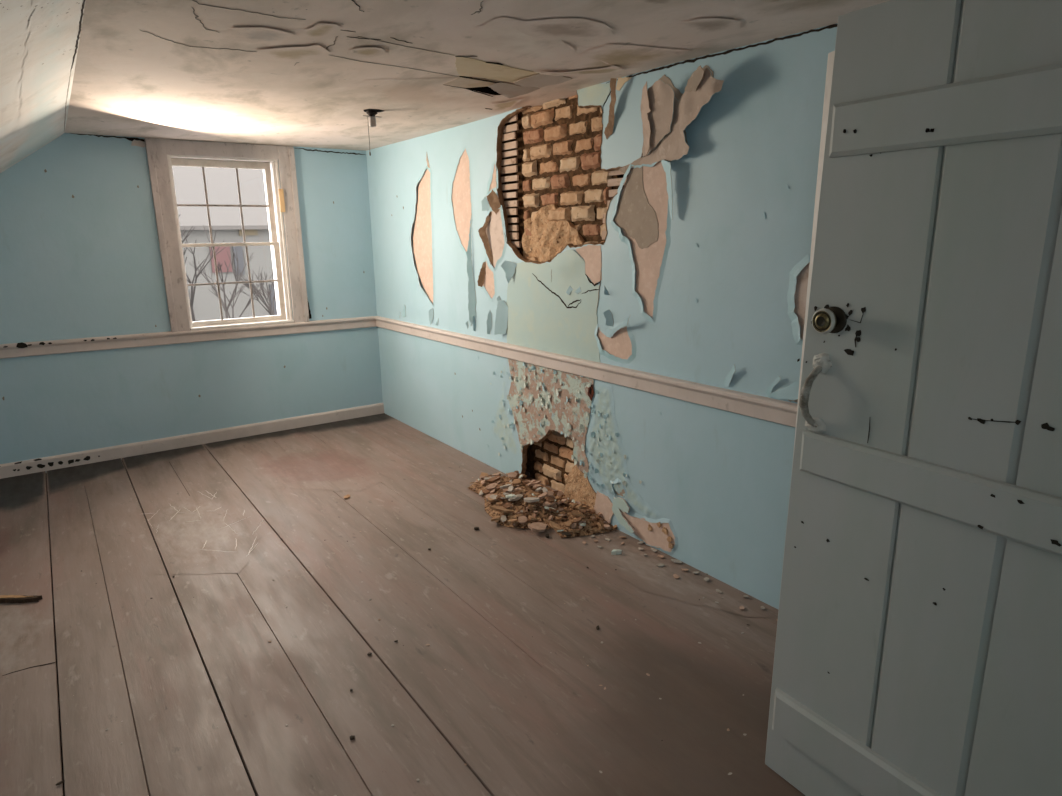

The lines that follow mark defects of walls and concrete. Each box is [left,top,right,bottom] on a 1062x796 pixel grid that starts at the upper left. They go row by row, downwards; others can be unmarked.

crack [64,0,145,140]
crack [140,0,306,52]
crack [326,0,458,77]
flaking render [659,74,683,100]
crack [607,24,838,83]
flaking render [413,169,438,325]
flaking render [452,149,471,252]
flaking render [465,77,671,363]
flaking render [794,262,829,339]
peeling [13,456,100,471]
peeling [506,358,678,555]